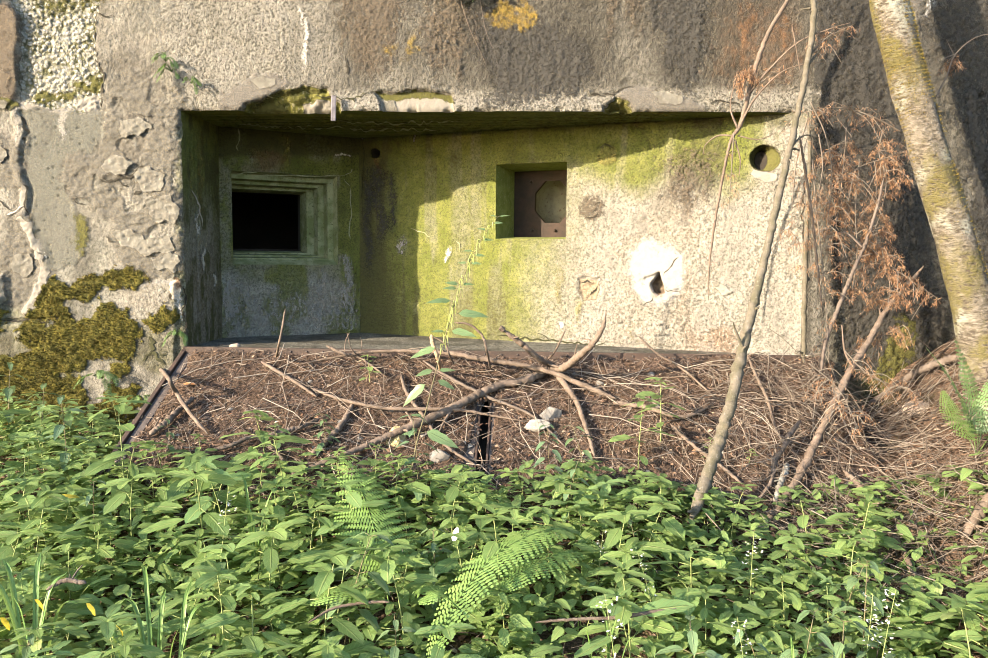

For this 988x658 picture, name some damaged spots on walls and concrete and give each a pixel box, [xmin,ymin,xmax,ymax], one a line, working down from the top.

spalling [219,73,341,114]
spalling [373,88,455,113]
flaking render [0,0,185,312]
damp [201,165,429,338]
spalling [626,236,686,305]